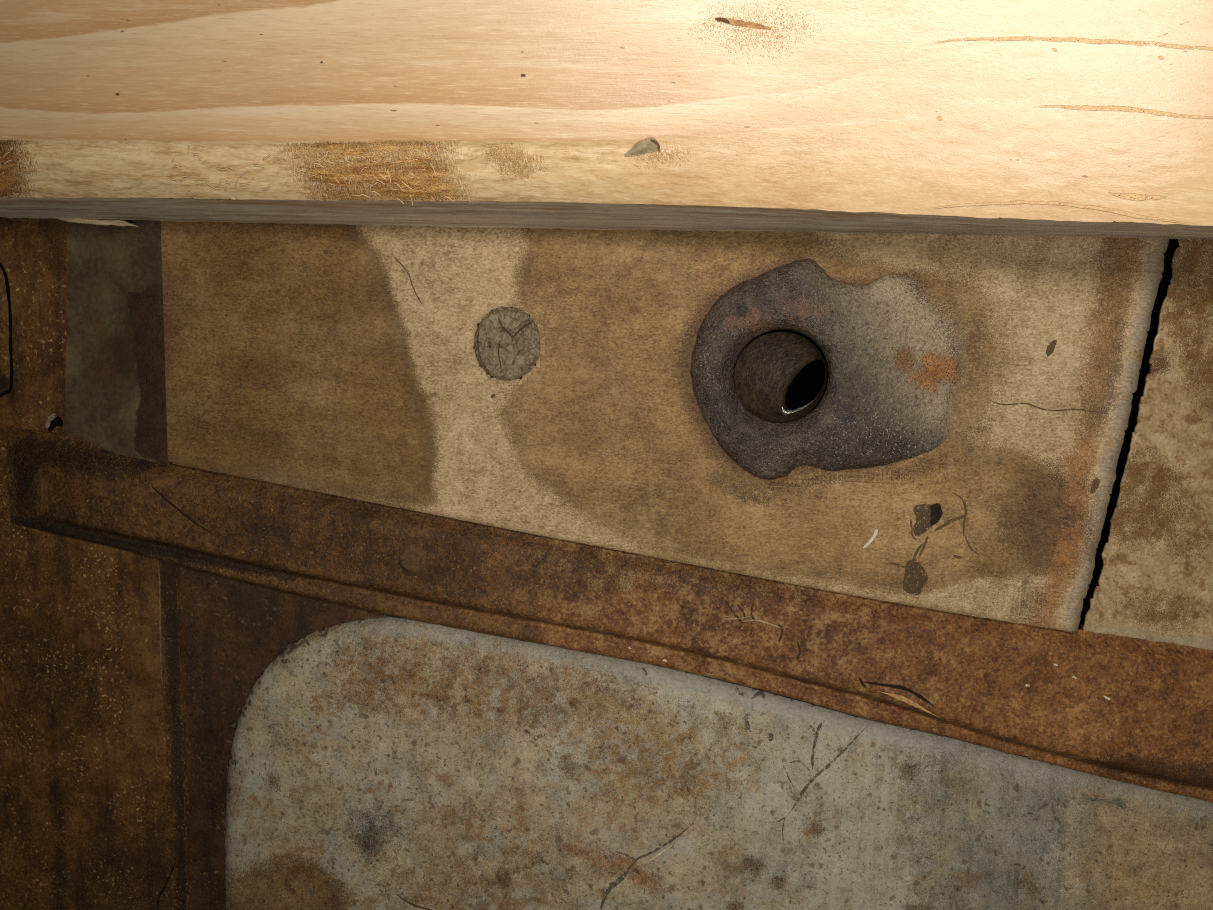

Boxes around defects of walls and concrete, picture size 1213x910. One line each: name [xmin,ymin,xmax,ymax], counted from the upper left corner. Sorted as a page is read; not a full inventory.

crack [0,263,14,397]
water stain [161,221,443,510]
water stain [494,228,1105,600]
rust [892,344,962,398]
crack [985,239,1179,618]